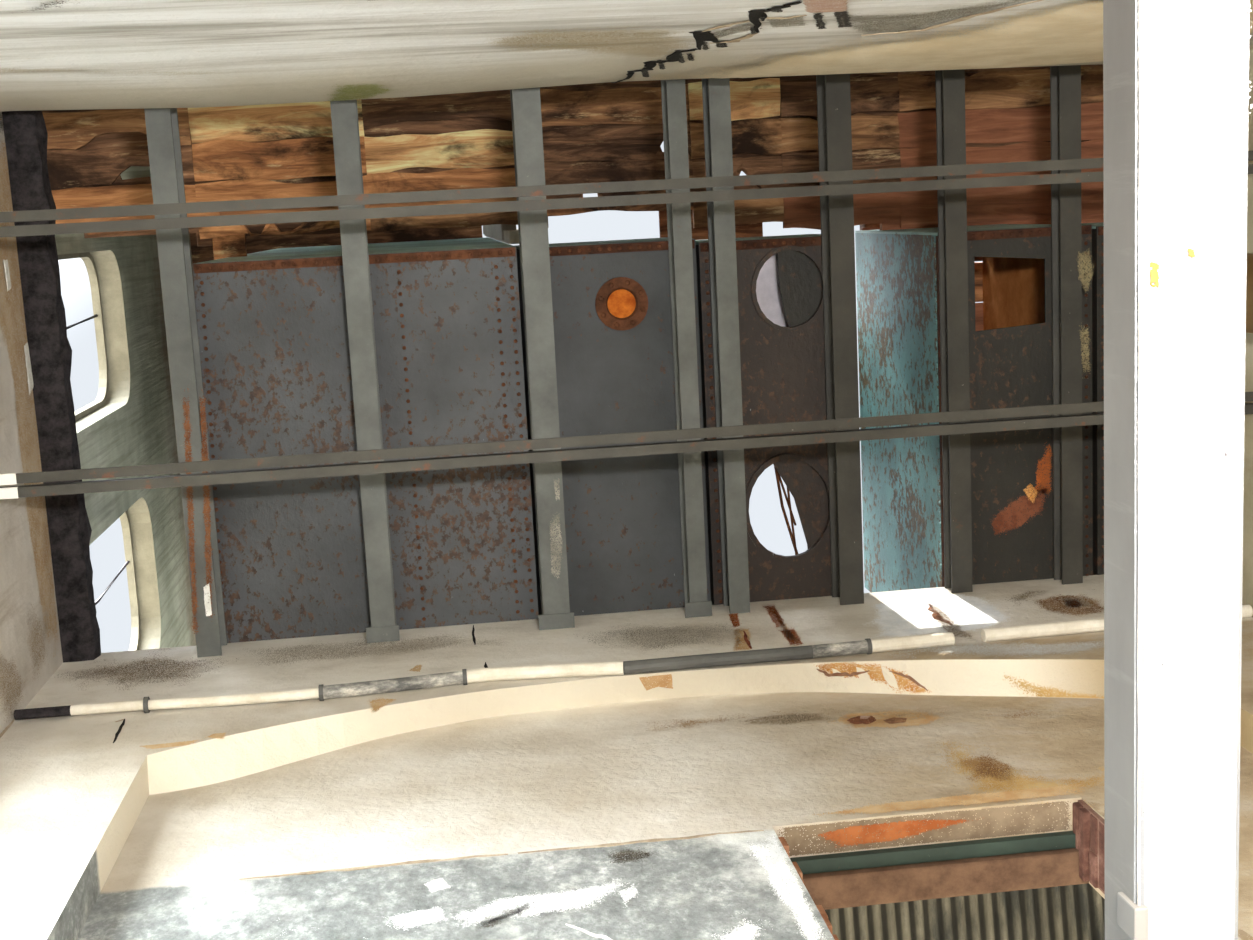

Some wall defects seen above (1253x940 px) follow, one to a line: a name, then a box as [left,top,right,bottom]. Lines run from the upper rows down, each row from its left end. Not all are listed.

crack [611,0,1043,83]
corrosion [181,374,215,643]
corrosion [990,437,1053,536]